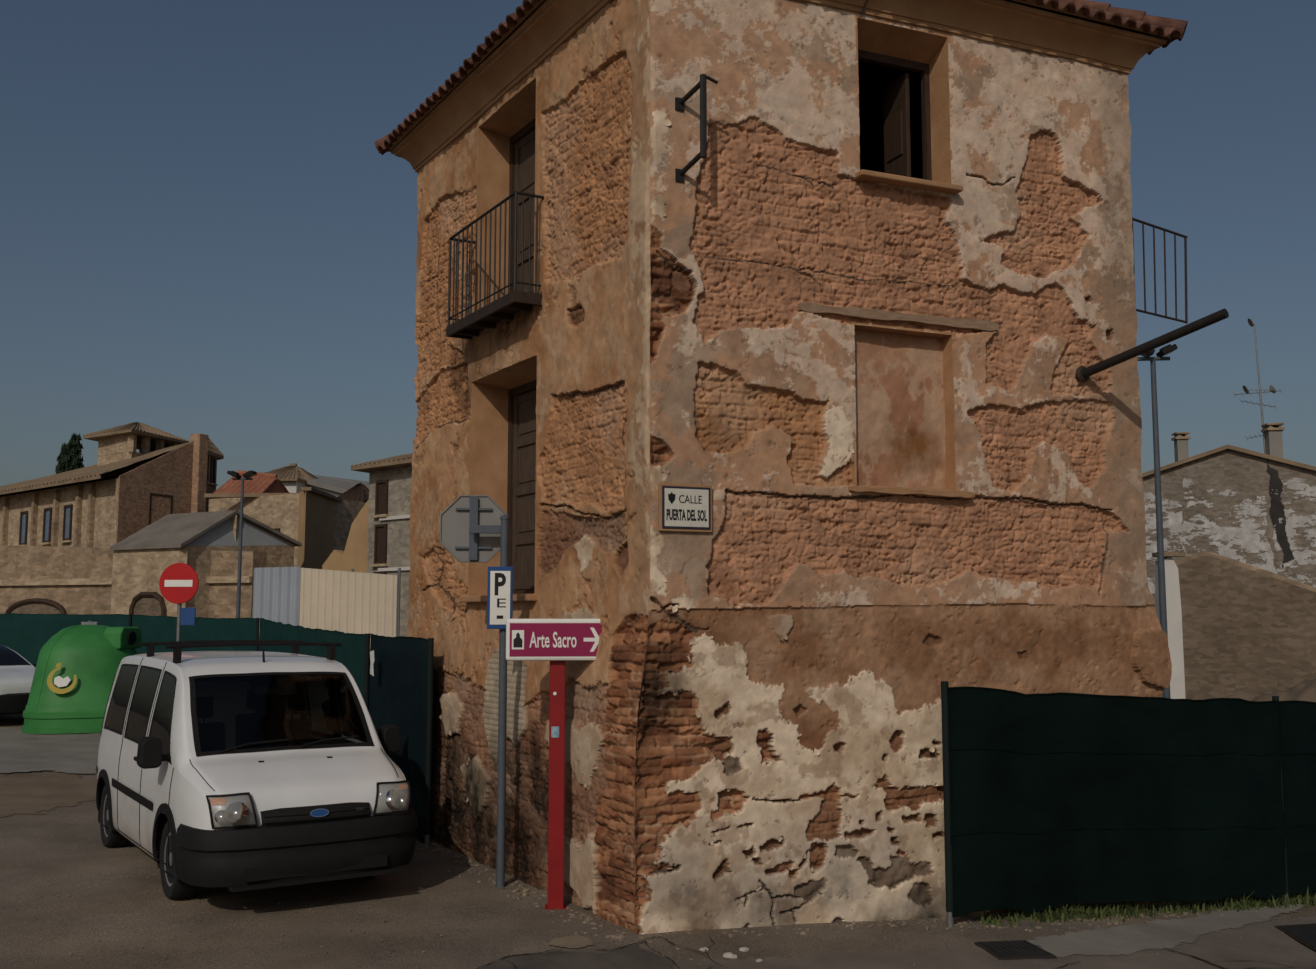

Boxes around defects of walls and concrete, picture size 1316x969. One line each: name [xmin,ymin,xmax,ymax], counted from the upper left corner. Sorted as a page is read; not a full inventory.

spalling [541,51,632,284]
spalling [566,302,585,327]
spalling [650,110,1316,641]
spalling [422,545,472,619]
peeling [440,692,465,736]
peeling [460,648,527,811]
peeling [565,718,605,789]
peeling [639,632,989,934]
peeling [564,832,599,914]